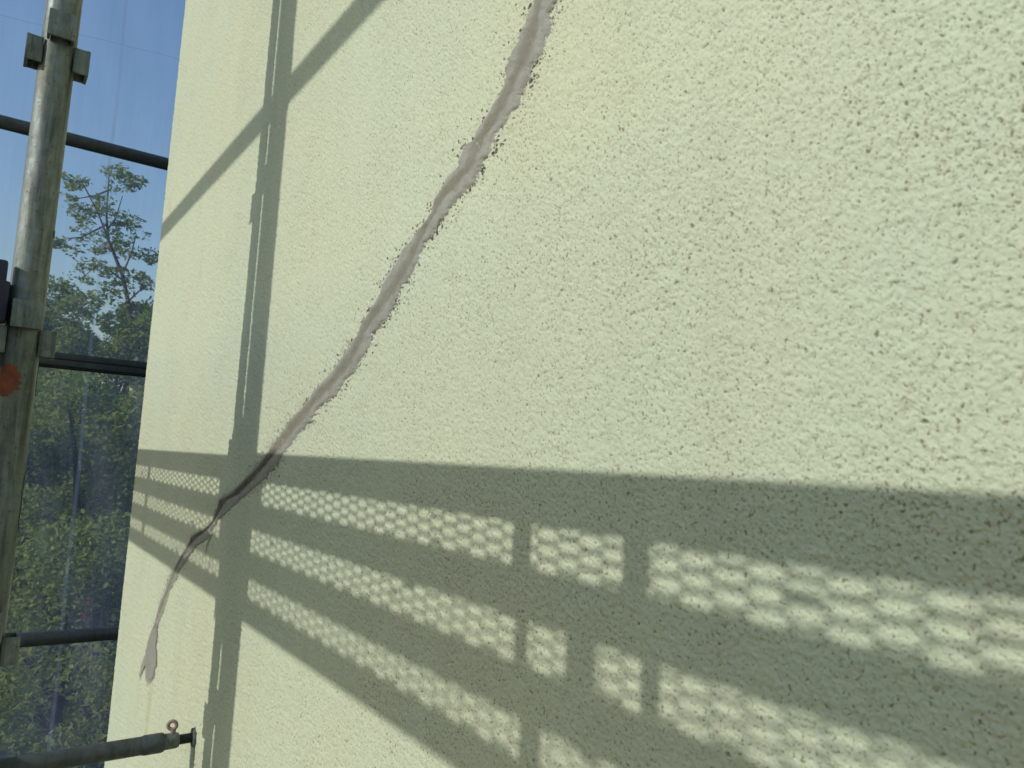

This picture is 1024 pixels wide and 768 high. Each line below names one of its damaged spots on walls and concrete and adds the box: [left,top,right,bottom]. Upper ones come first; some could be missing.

crack [139,0,574,682]